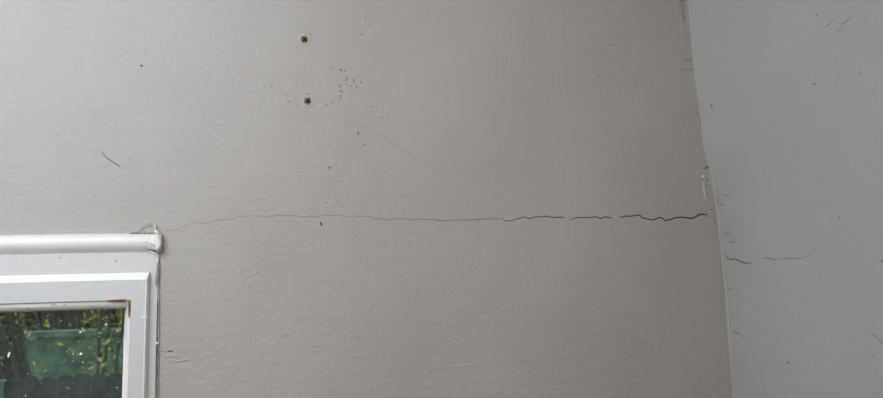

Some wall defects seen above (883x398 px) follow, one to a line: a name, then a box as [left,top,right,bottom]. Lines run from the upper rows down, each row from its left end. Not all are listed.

crack [165,211,709,232]
crack [148,277,159,398]